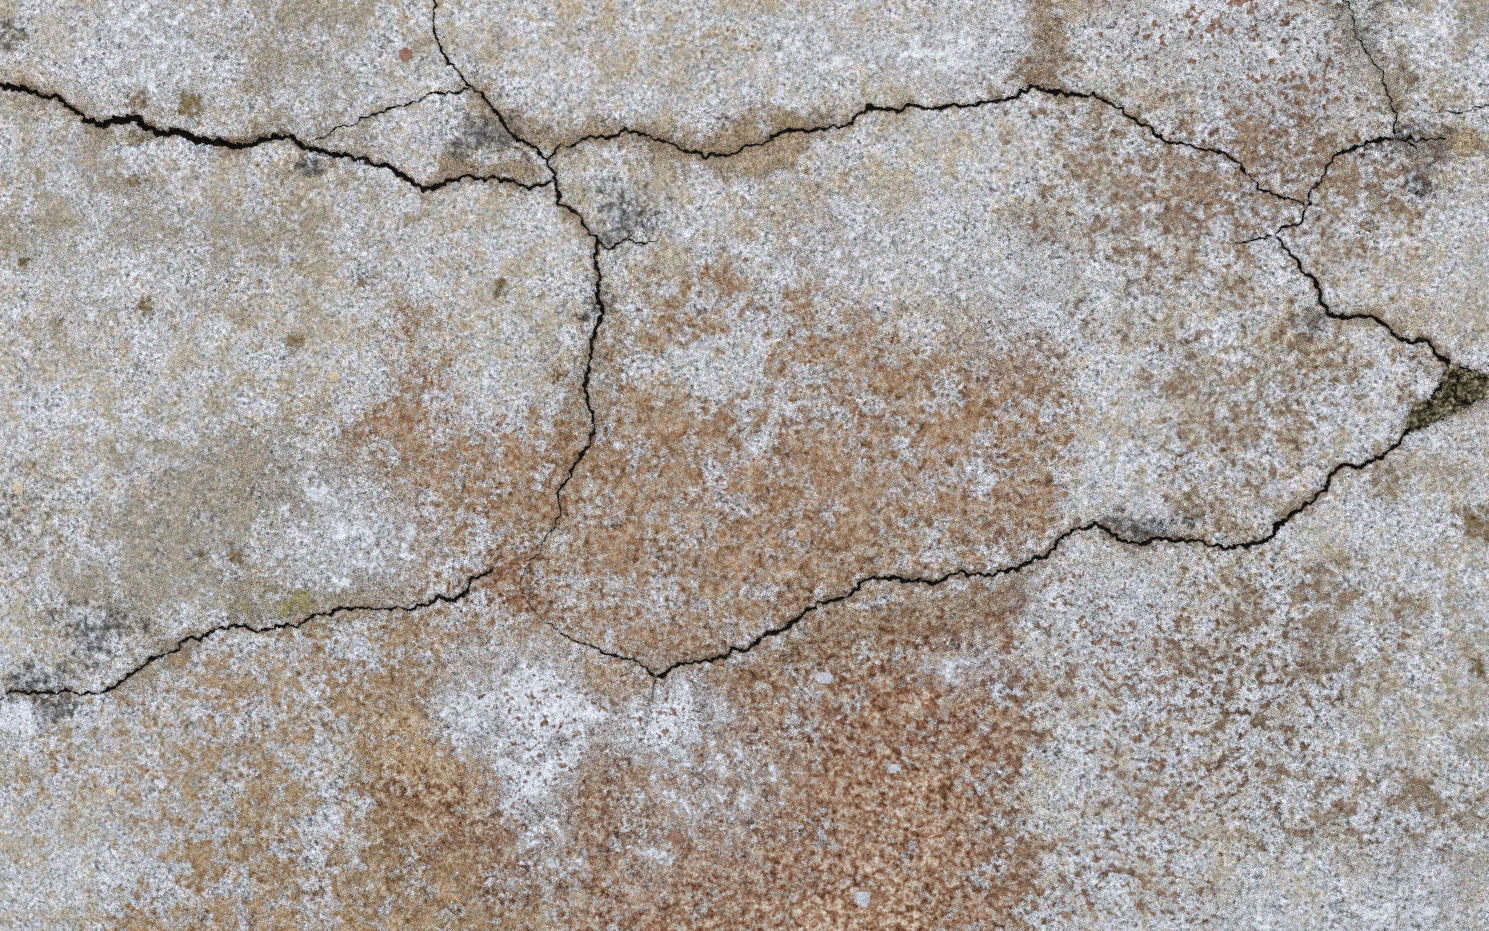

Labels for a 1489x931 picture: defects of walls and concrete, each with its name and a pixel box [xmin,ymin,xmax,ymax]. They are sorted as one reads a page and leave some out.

rust [643,254,767,347]
crack [0,0,1489,700]
rust [956,0,1452,335]
rust [43,728,121,794]
rust [109,286,1485,931]